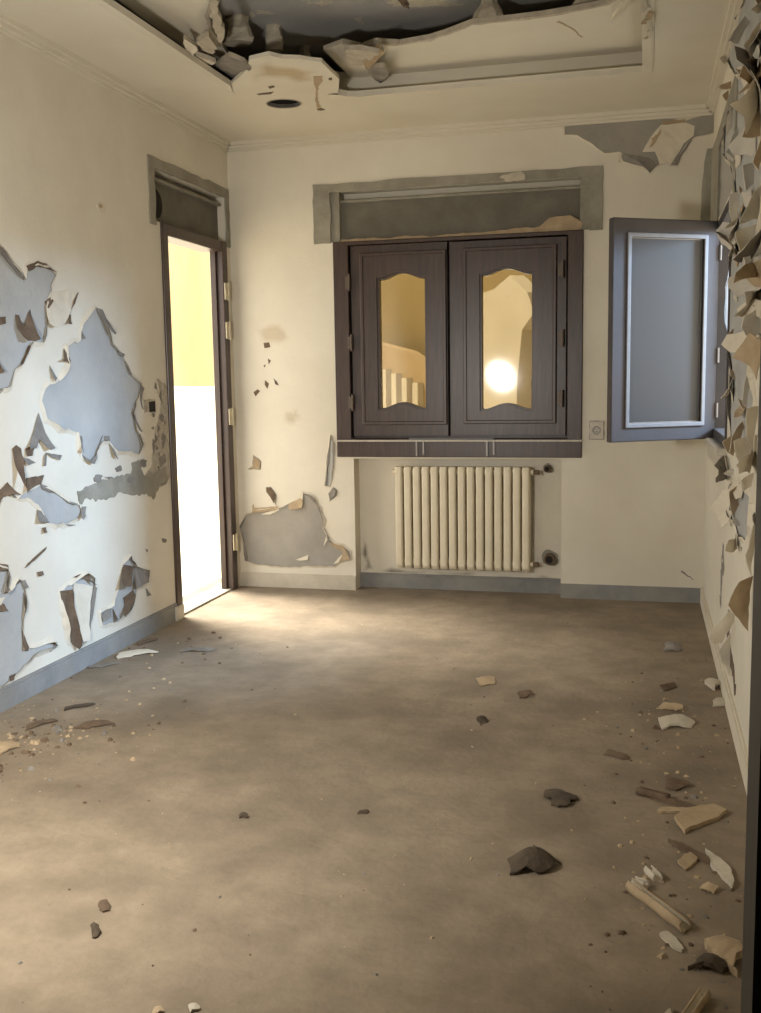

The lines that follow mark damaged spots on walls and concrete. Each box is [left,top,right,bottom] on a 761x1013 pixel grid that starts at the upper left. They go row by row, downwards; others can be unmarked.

peeling [0,547,151,688]
peeling [0,244,170,533]
peeling [239,435,352,569]
peeling [563,0,761,676]